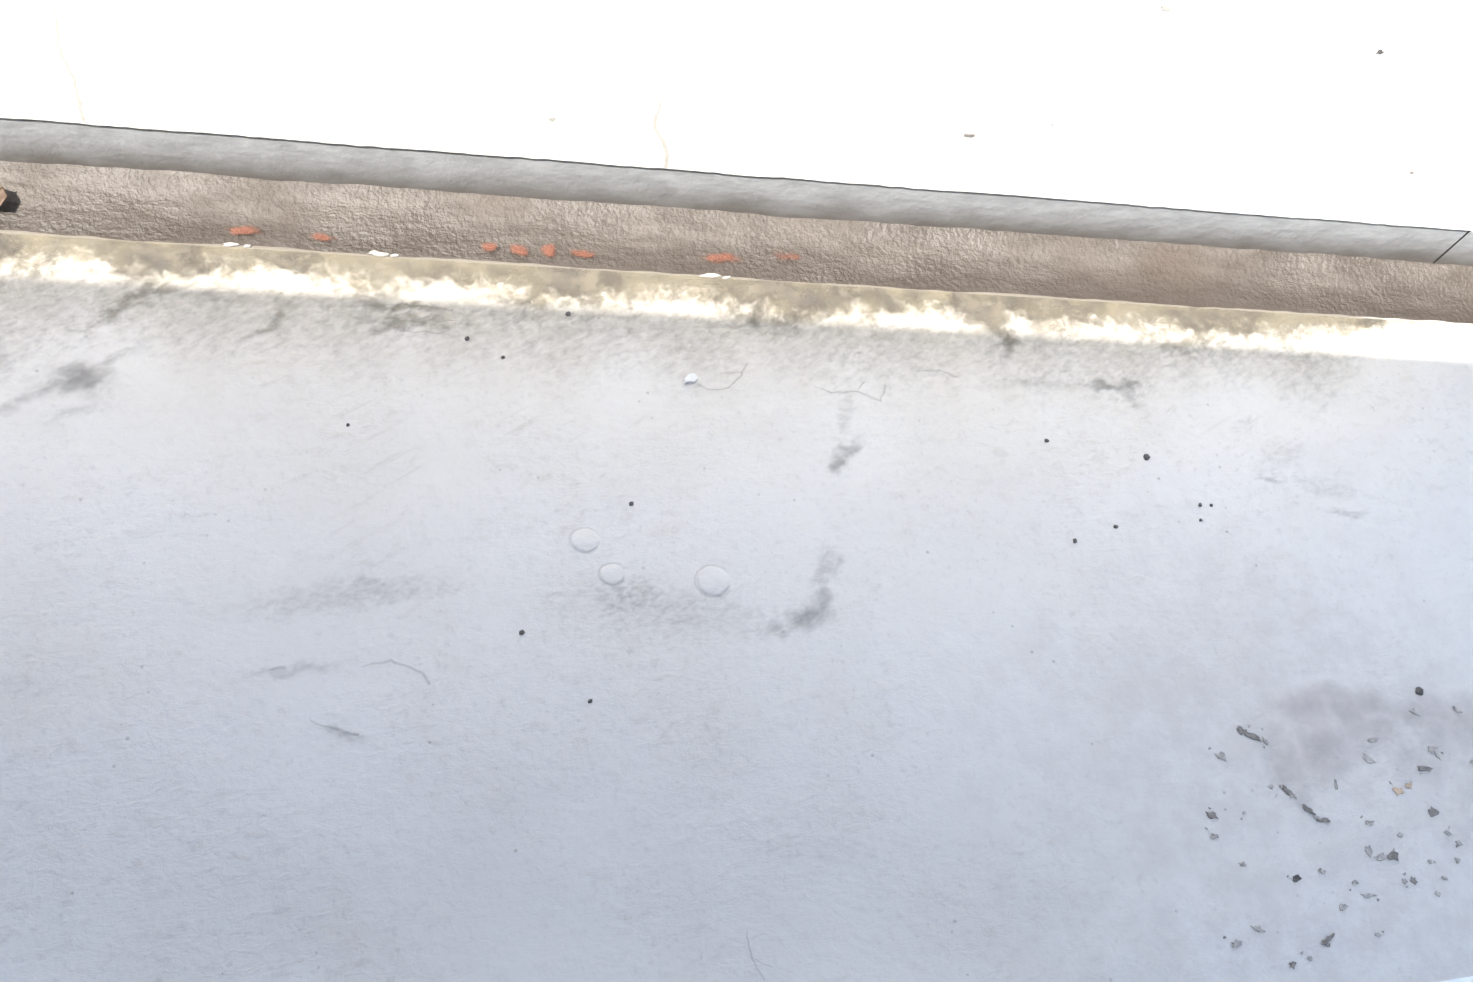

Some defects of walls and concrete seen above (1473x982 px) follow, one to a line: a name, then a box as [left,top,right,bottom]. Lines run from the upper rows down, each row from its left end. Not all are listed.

damp [0,233,1384,340]
peeling [1237,725,1269,749]
peeling [1389,746,1444,796]
peeling [1268,785,1331,823]
peeling [1205,807,1219,840]
peeling [1365,832,1418,888]
peeling [1428,806,1463,897]
peeling [1339,880,1380,911]
peeling [1223,926,1266,948]
peeling [1289,933,1335,969]